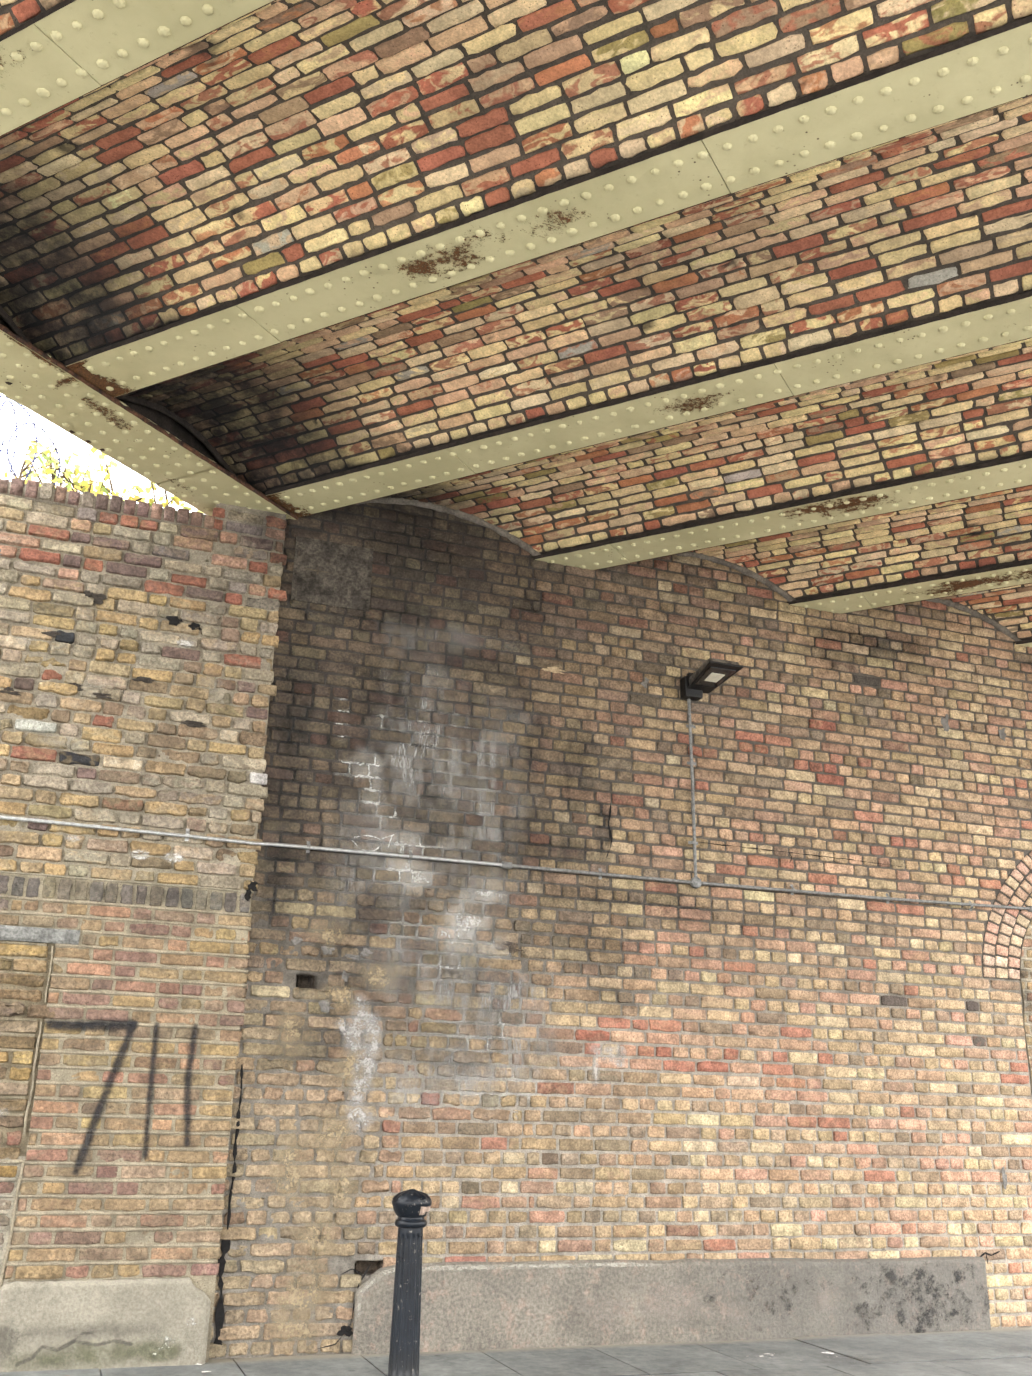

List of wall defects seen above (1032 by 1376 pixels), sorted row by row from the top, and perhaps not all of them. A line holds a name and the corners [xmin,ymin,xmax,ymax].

corrosion [398,207,591,282]
corrosion [657,392,730,414]
corrosion [784,495,900,522]
water stain [391,698,441,794]
water stain [438,958,536,1013]
water stain [338,997,381,1127]